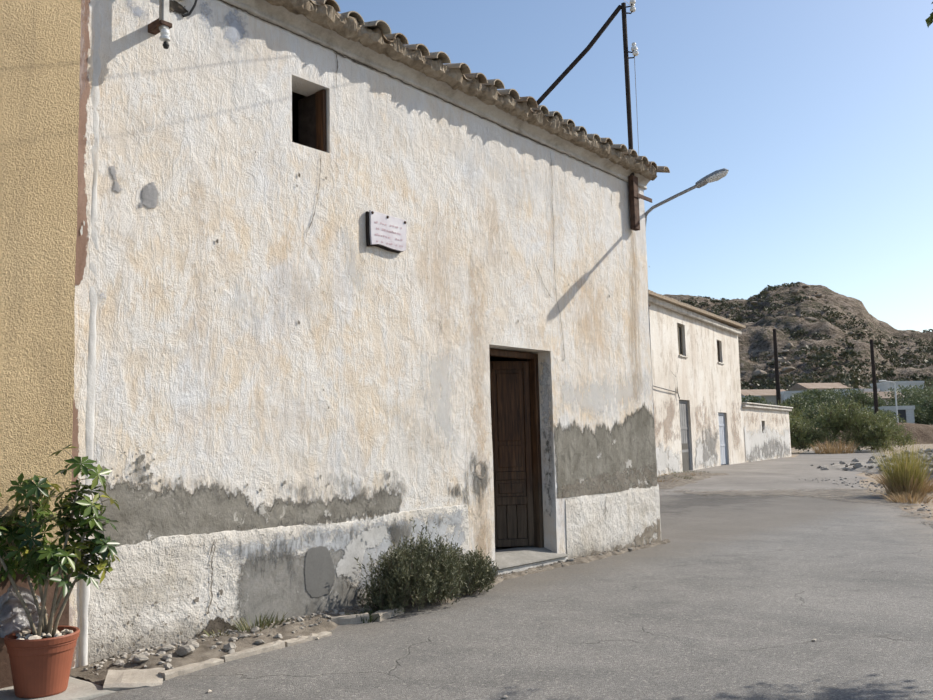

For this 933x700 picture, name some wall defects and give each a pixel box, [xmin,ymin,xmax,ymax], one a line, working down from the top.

crack [218,0,642,370]
peeling [71,399,79,499]
peeling [554,402,658,498]
water stain [700,427,719,465]
crack [208,540,220,614]
peeling [71,451,402,675]
water stain [219,457,490,590]